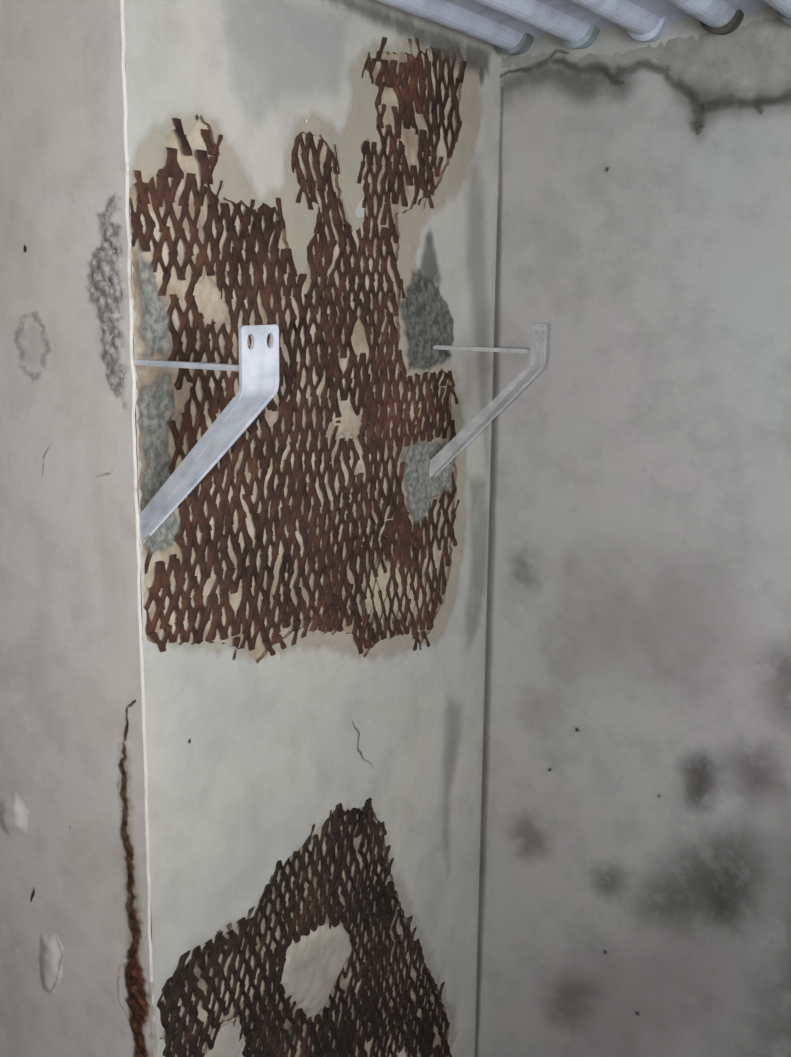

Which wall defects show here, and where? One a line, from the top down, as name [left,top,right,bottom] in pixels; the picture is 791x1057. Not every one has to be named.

flaking render [89,37,467,661]
flaking render [157,798,452,1057]